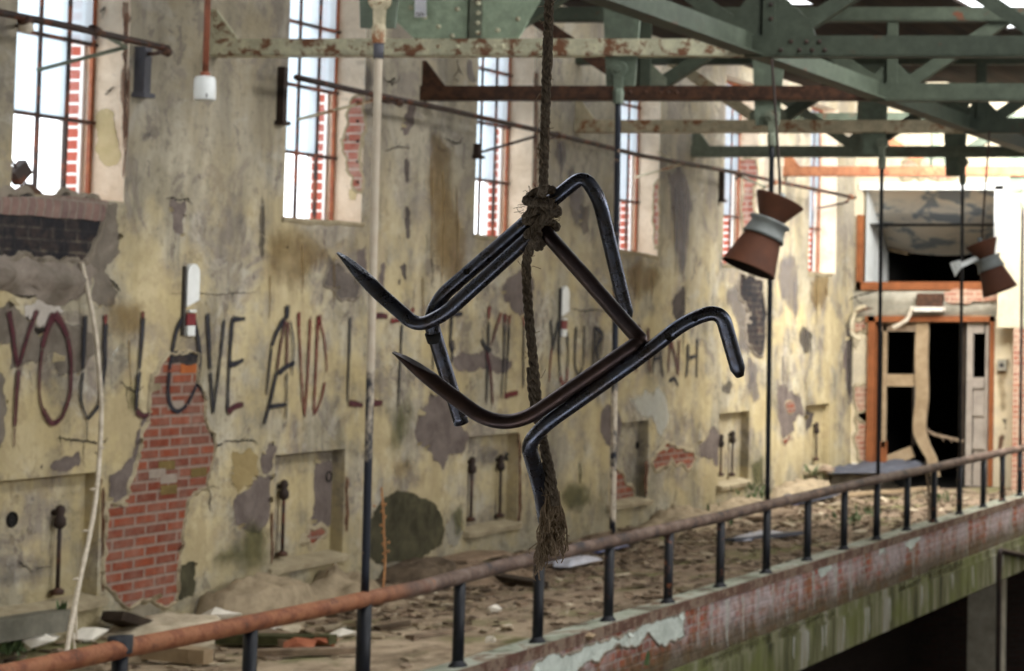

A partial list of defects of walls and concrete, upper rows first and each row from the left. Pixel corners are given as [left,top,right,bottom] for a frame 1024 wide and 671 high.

flaking render [340,94,368,200]
flaking render [0,185,123,308]
flaking render [100,349,217,611]
peeling [229,441,277,532]
damp [370,491,445,565]
flaking render [650,426,720,474]
peeling [777,384,814,446]
peeling [530,611,685,671]